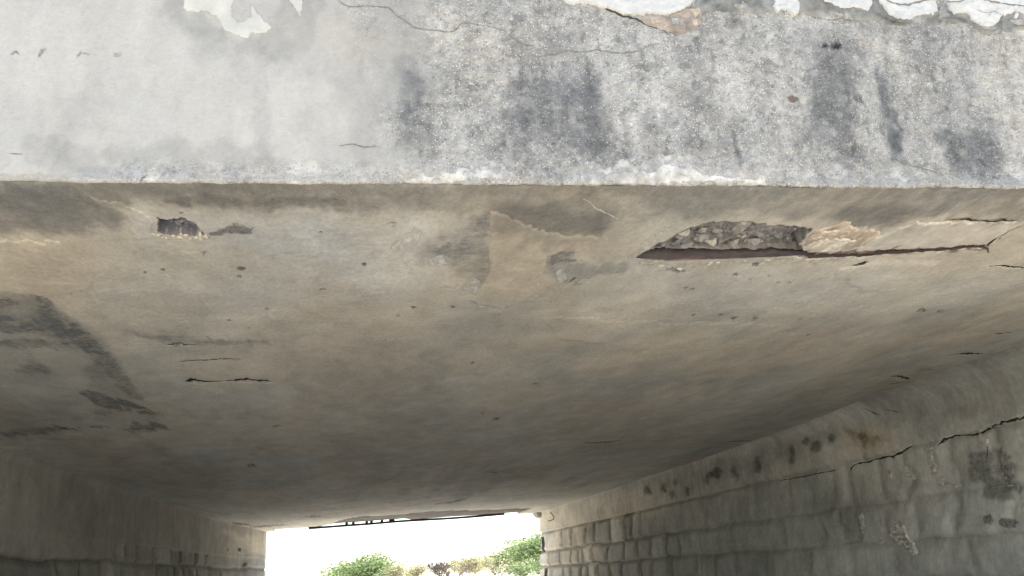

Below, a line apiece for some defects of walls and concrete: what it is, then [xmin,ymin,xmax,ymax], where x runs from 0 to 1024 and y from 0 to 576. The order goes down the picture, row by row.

peeling [183,0,271,38]
peeling [289,0,303,17]
crack [340,1,676,67]
spalling [563,0,1024,36]
peeling [89,196,252,241]
spalling [636,220,1016,272]
crack [793,218,1024,269]
crack [780,414,1024,481]